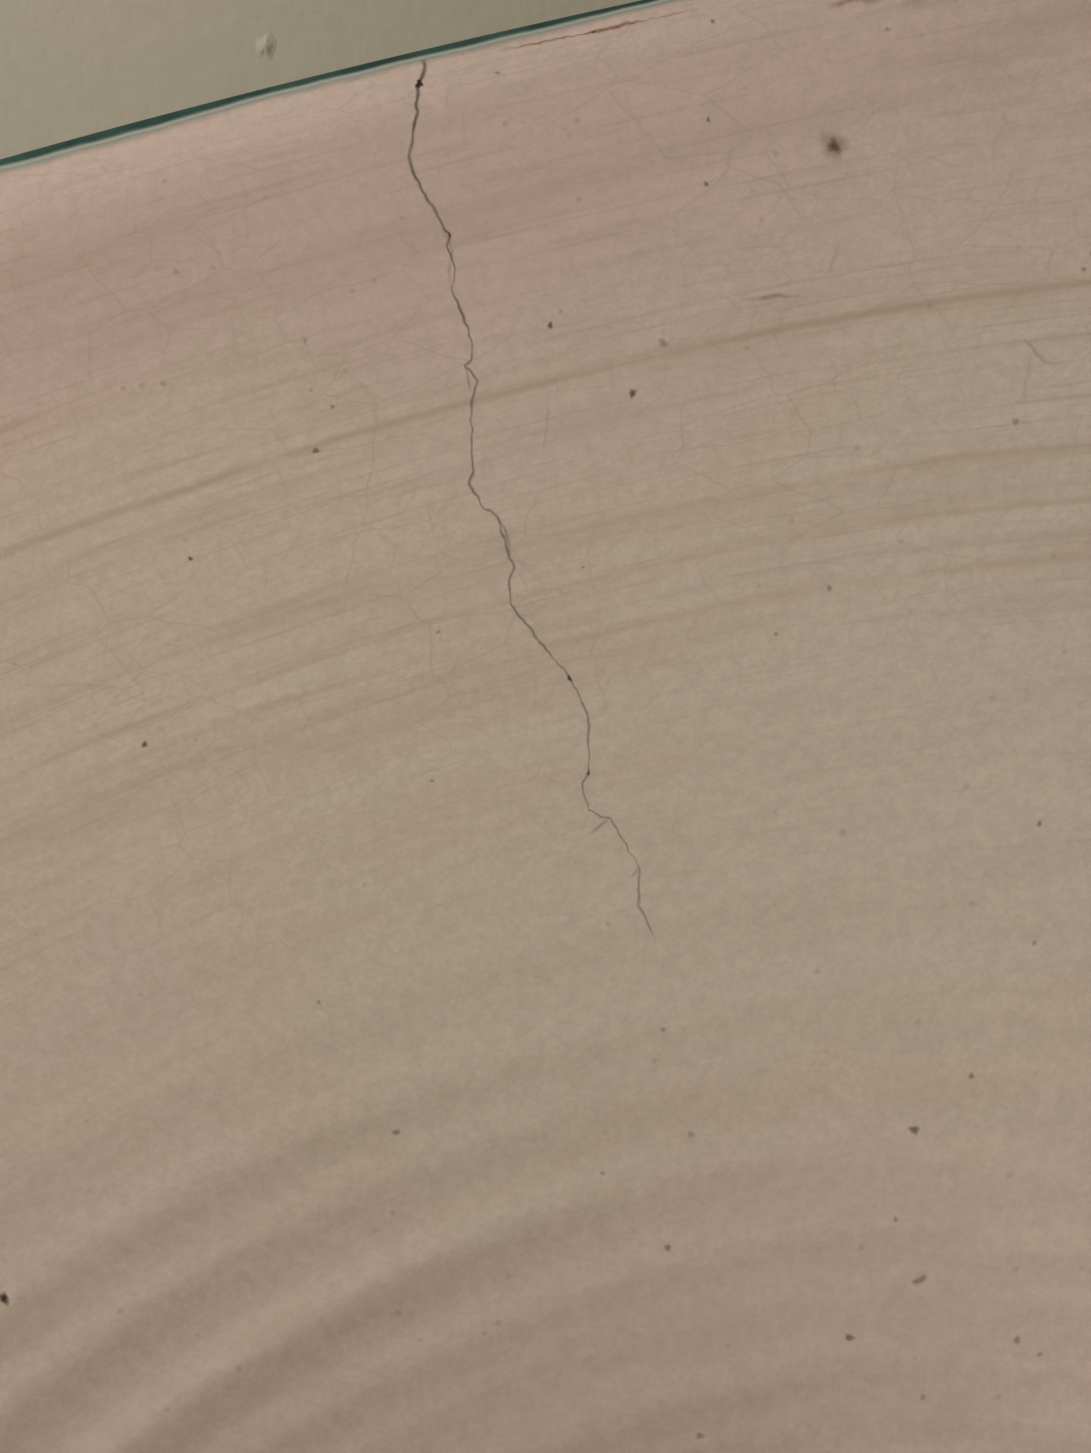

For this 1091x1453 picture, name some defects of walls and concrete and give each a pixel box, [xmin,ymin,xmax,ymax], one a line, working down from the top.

crack [408,64,475,494]